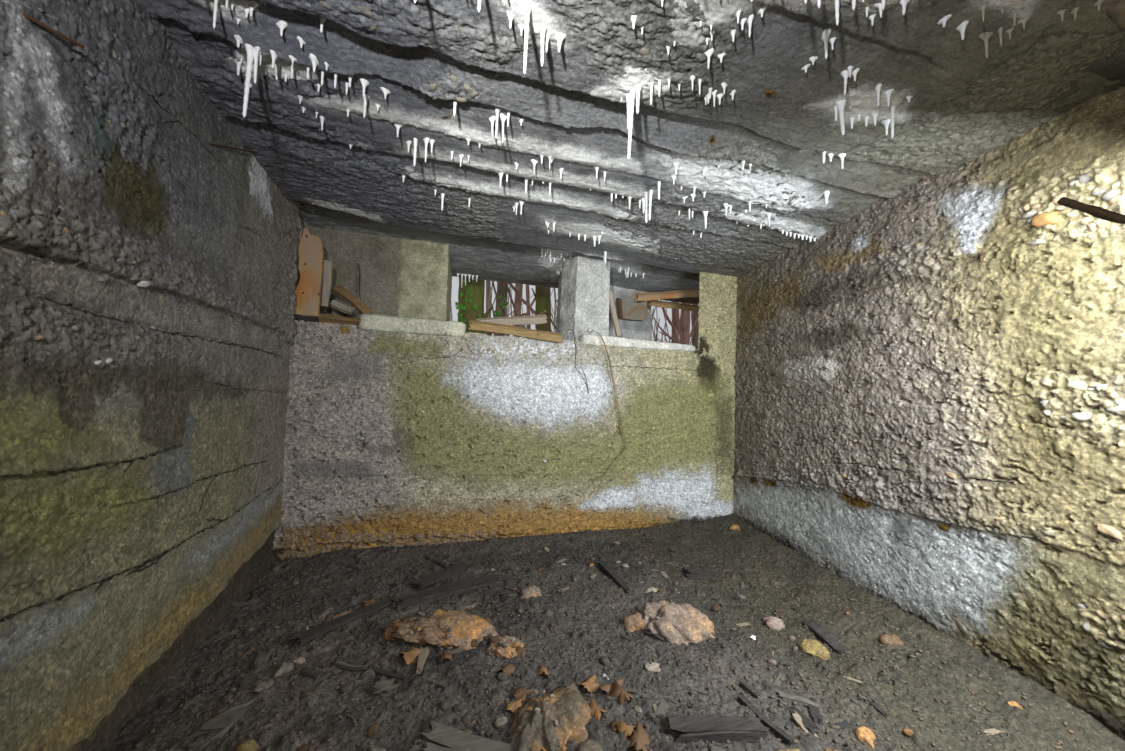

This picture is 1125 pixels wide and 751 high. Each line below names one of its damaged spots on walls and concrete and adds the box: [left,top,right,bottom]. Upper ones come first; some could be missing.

damp [200,0,257,21]
damp [497,0,565,48]
damp [668,0,899,48]
damp [808,83,908,124]
crack [147,94,250,193]
damp [227,45,829,278]
damp [946,191,1000,251]
damp [446,339,614,427]
damp [694,337,718,380]
crack [0,445,182,478]
crack [0,461,280,640]
damp [579,471,1125,741]